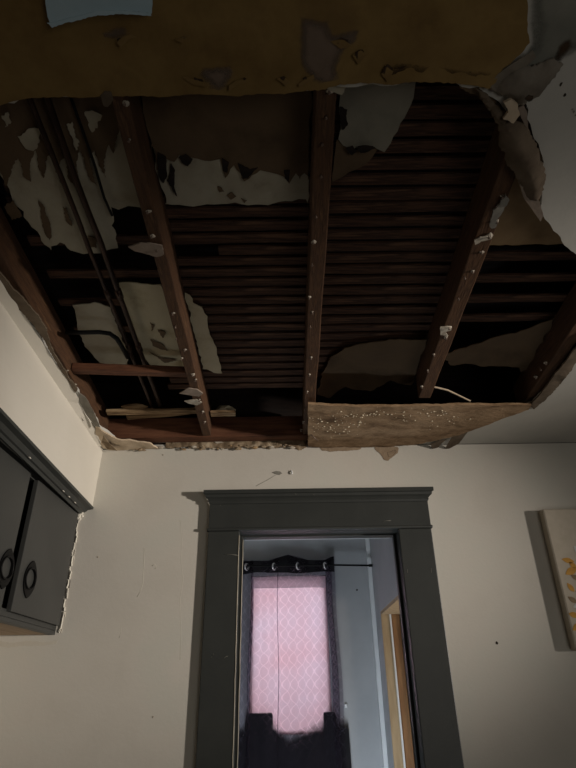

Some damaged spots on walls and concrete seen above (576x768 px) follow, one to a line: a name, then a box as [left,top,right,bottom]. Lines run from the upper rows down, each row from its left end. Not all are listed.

water stain [0,0,576,107]
flaking render [0,272,307,451]
flaking render [530,347,576,409]
peeling [375,446,399,461]